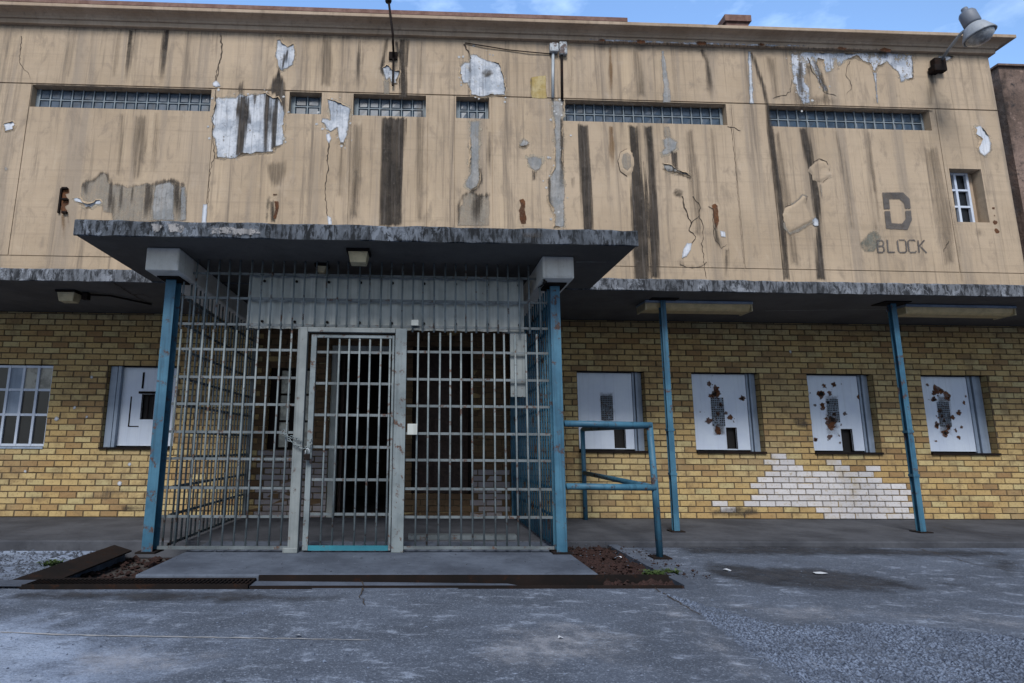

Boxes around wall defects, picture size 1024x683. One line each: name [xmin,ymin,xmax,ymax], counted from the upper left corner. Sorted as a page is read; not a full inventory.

peeling [458,45,507,103]
peeling [590,39,914,112]
crack [202,35,223,223]
peeling [206,88,289,160]
peeling [73,173,187,233]
crack [324,133,332,225]
leakage [380,117,407,226]
corrosion [519,199,527,224]
leakage [629,125,670,279]
crack [680,196,707,275]
corrosion [700,381,735,435]
corrosion [810,382,847,444]